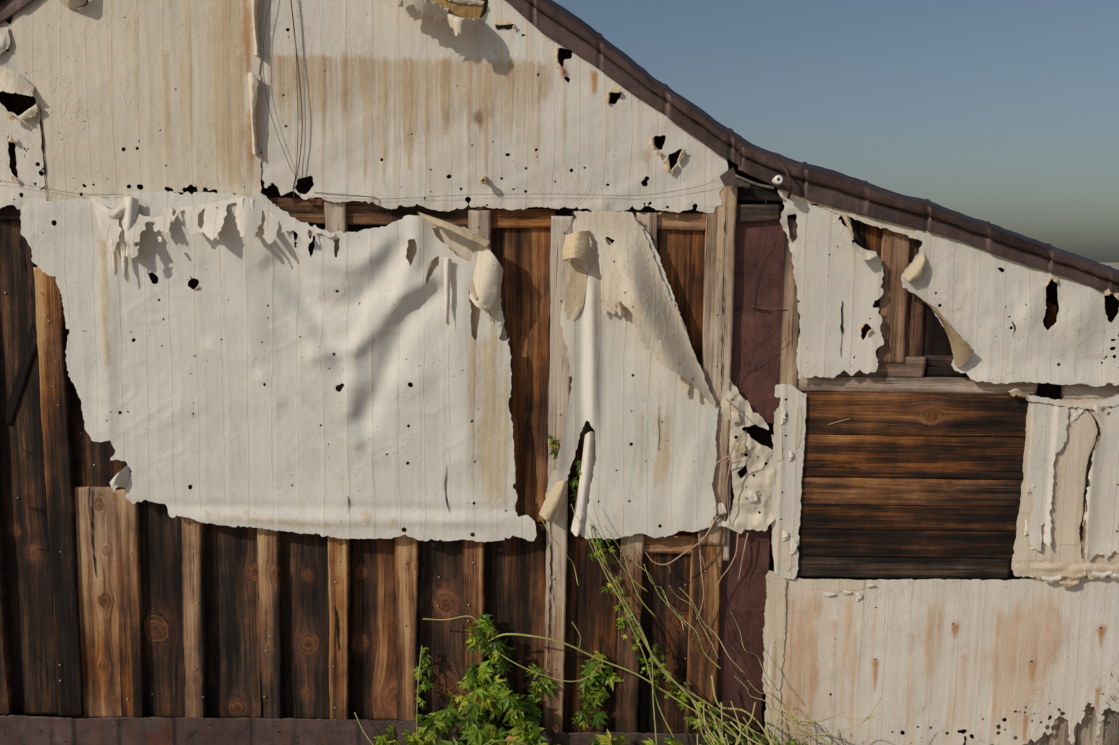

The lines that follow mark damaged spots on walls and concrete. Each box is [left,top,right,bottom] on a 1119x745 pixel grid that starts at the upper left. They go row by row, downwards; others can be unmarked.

peeling [5,104,38,121]
peeling [775,406,802,462]
peeling [1016,403,1119,562]
peeling [774,526,797,572]